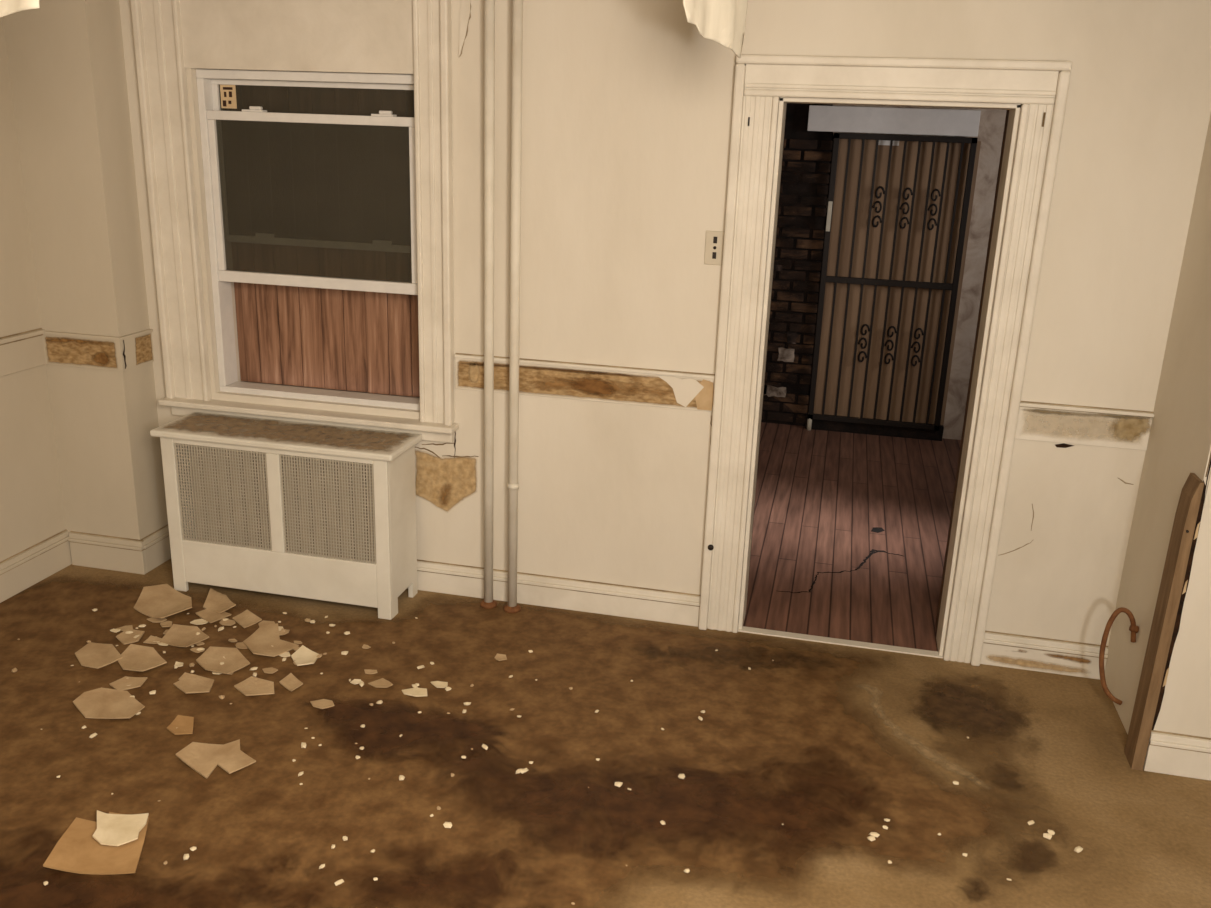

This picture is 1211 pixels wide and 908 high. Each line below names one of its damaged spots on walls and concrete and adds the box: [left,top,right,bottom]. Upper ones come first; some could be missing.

flaking render [761,103,834,426]
peeling [46,334,153,369]
peeling [458,361,714,411]
flaking render [415,432,479,511]
leakage [0,578,1055,908]